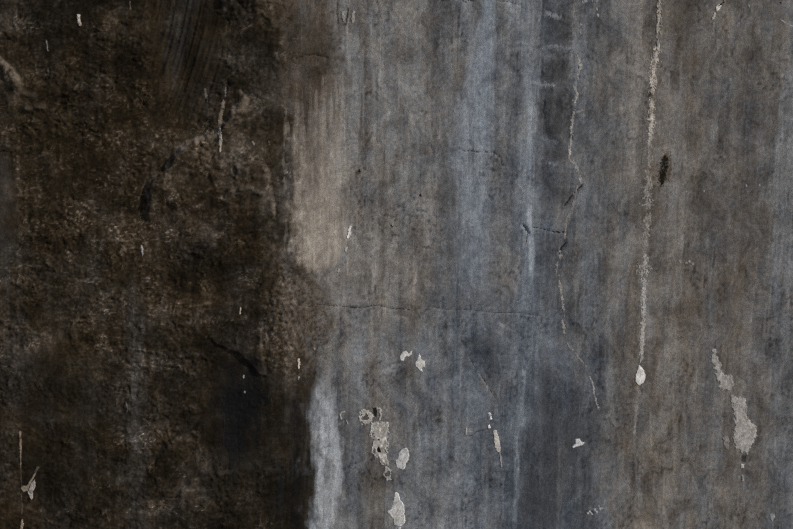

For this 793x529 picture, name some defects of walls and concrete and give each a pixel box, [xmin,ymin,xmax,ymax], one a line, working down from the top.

crack [316,304,540,318]
water stain [446,0,643,529]
crack [522,54,600,410]
water stain [628,0,668,365]
water stain [671,65,688,268]
flaking render [358,406,409,481]
flaking render [387,492,405,529]
flaking render [711,348,758,482]